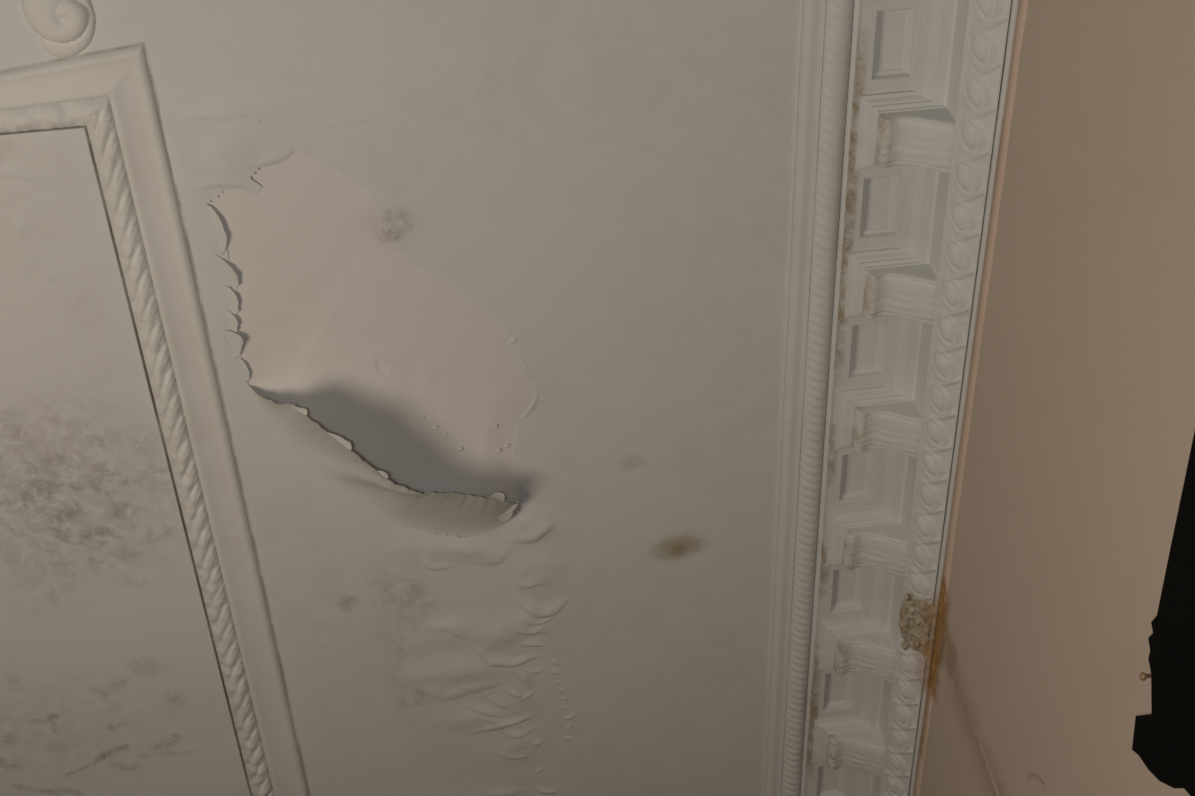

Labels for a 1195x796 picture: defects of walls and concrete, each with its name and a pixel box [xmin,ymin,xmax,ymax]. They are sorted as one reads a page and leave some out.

peeling [207,150,543,538]